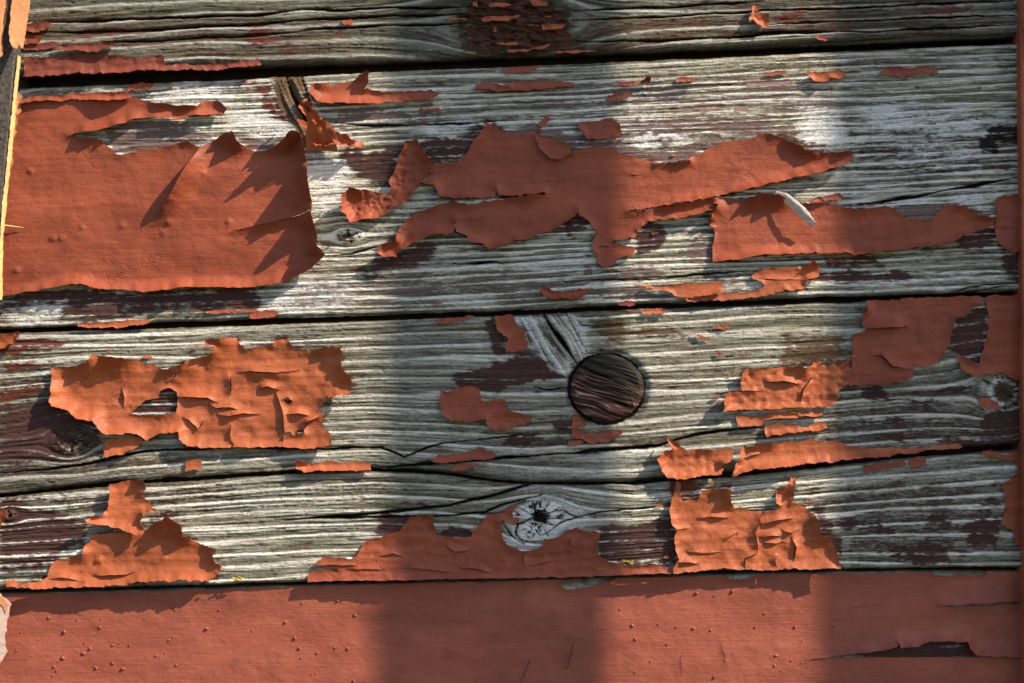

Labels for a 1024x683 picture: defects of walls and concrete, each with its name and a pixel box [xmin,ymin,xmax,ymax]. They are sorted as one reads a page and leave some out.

peeling [472,0,593,53]
peeling [749,3,770,29]
peeling [475,65,574,92]
peeling [605,76,651,101]
peeling [807,70,846,82]
peeling [879,66,938,78]
peeling [0,0,443,300]
crack [860,178,1017,204]
peeling [341,116,1020,302]
crack [3,427,776,544]
peeling [0,294,1022,683]